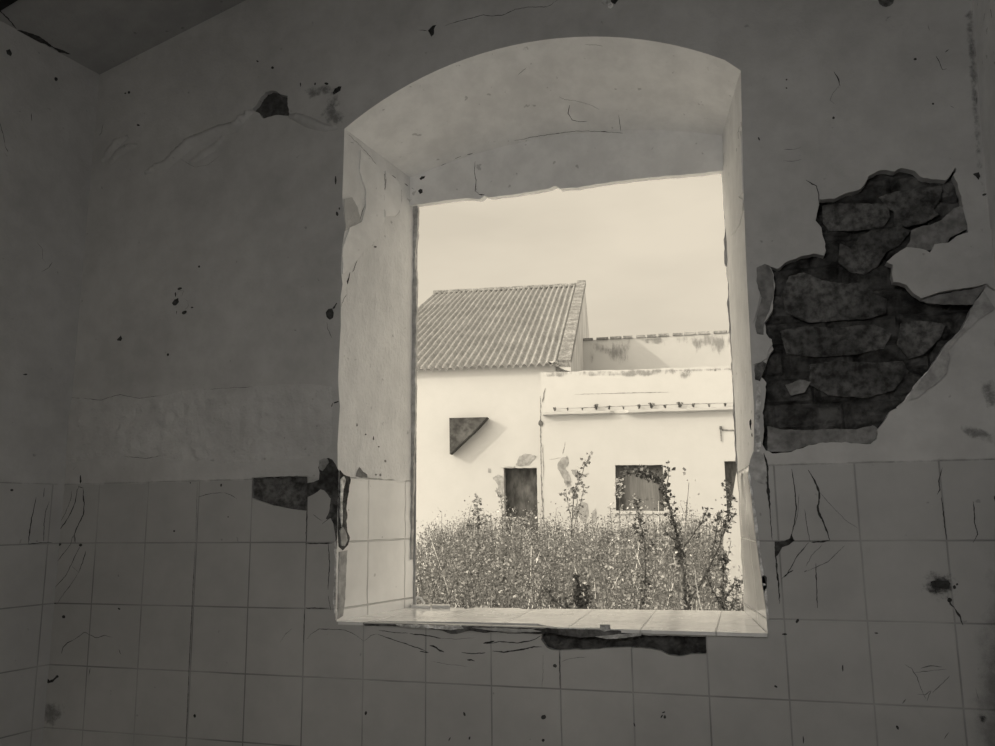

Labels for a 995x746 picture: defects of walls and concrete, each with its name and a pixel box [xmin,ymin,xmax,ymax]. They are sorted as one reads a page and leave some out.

spalling [256,93,289,118]
spalling [727,172,995,620]
spalling [254,458,381,620]
crack [280,512,584,681]
crack [764,454,856,608]